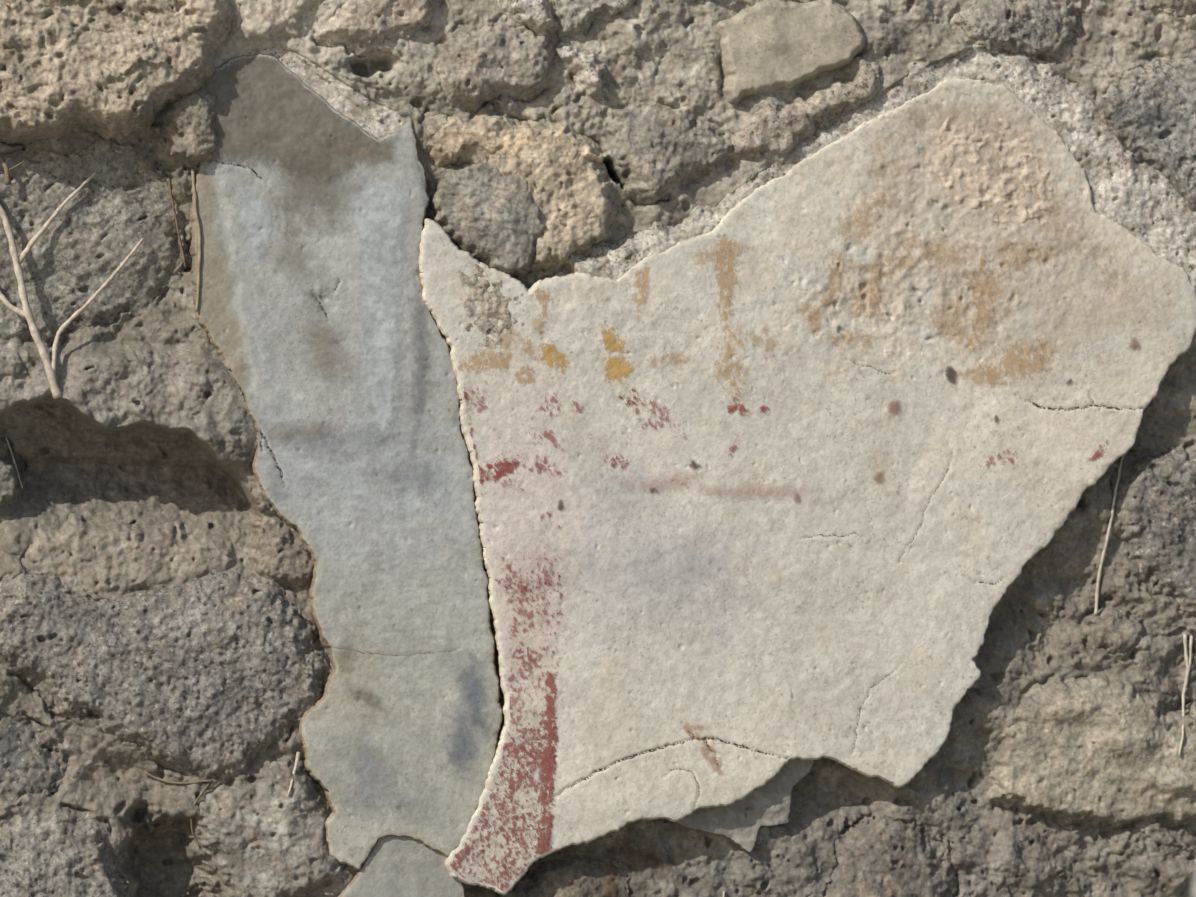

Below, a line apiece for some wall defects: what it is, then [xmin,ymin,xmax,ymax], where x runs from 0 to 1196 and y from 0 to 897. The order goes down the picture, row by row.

crack [1020,395,1141,411]
crack [899,456,952,562]
crack [560,725,788,802]